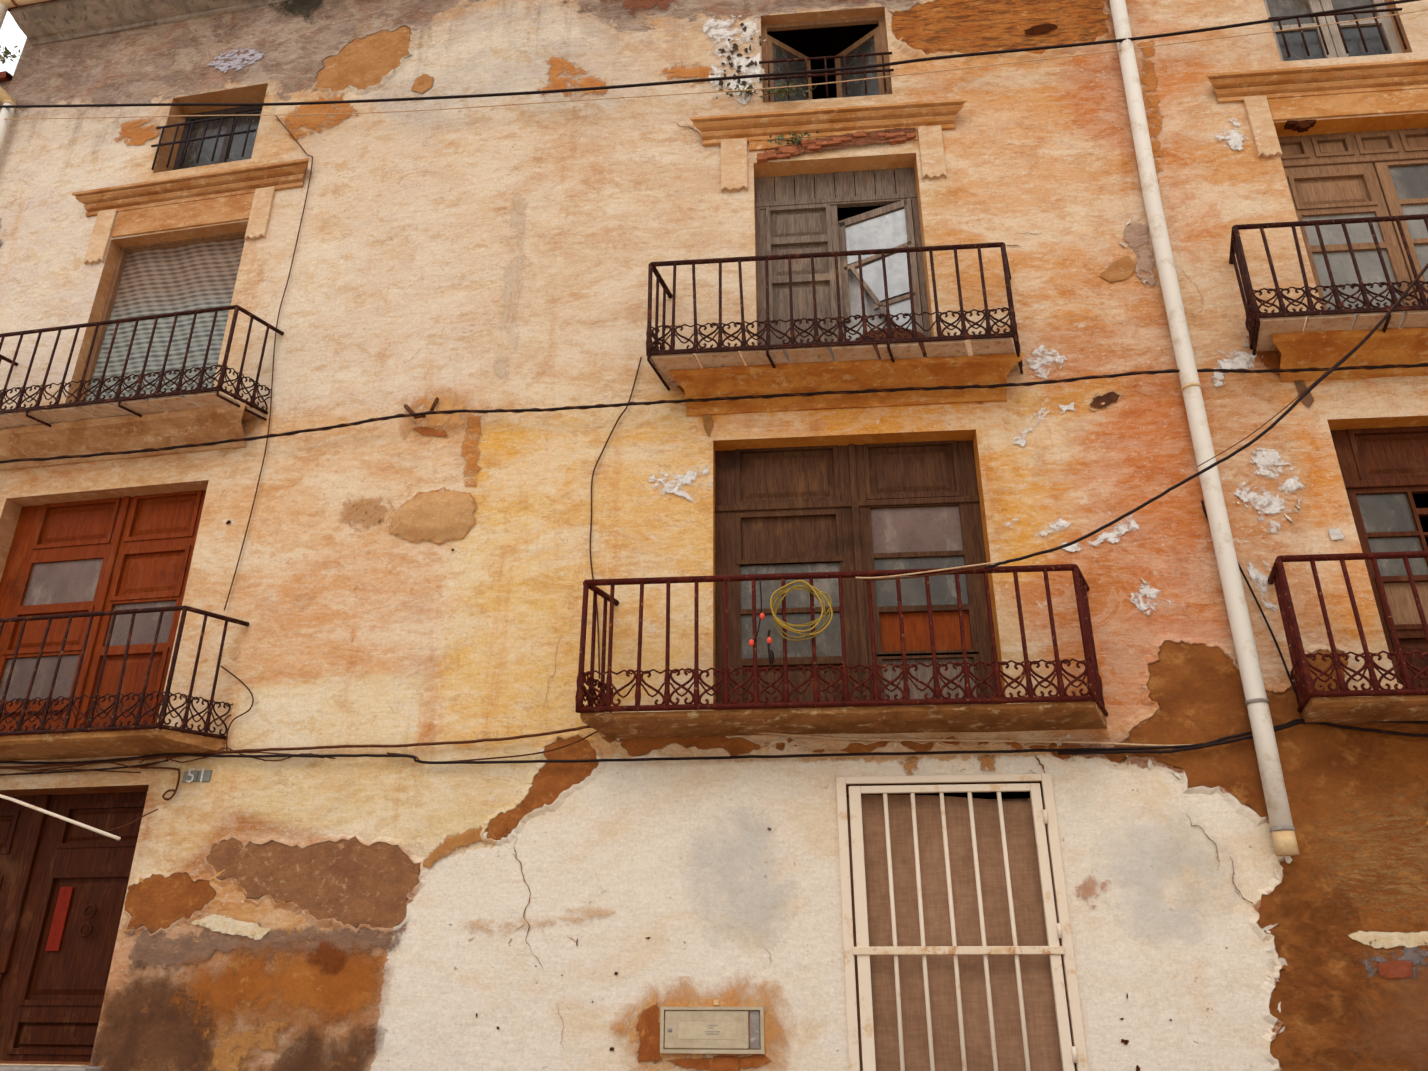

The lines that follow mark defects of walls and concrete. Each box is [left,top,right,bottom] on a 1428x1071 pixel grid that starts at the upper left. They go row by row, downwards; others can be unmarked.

peeling [276,22,434,140]
peeling [662,15,766,105]
flaking render [887,0,1115,63]
peeling [1234,447,1309,534]
peeling [1305,642,1404,697]
peeling [122,632,1270,940]
crack [512,840,542,966]
peeling [1249,669,1428,1071]
water stain [87,923,406,1071]